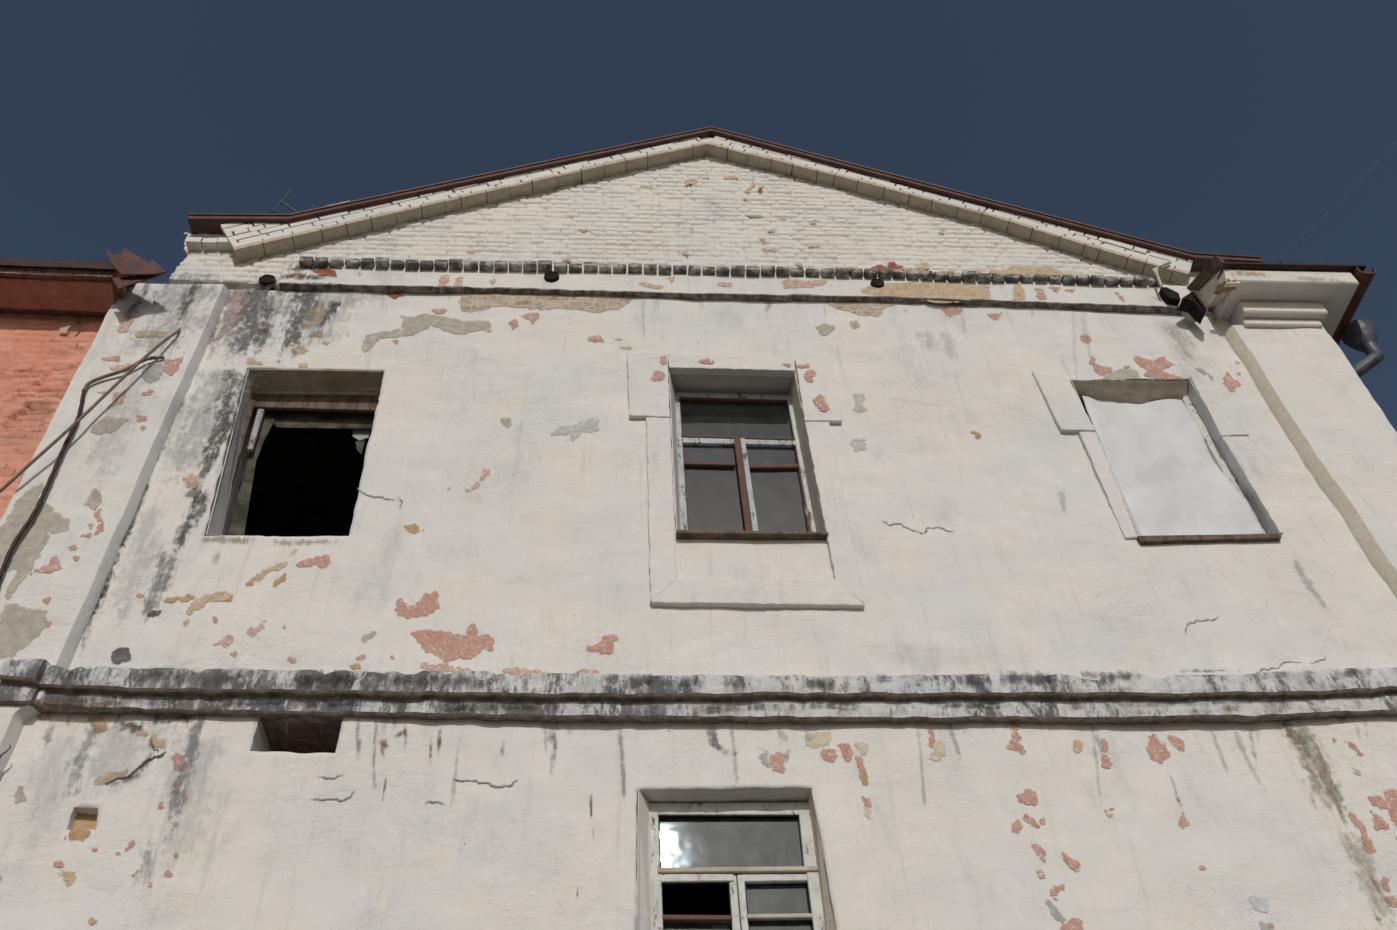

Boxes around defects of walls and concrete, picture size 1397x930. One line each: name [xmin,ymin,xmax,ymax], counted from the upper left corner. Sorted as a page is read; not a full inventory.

flaking render [361,275,674,352]
peeling [1080,334,1241,392]
crack [884,521,950,533]
peeling [0,483,104,659]
damp [83,483,149,639]
damp [111,647,131,664]
damp [224,669,376,704]
peeling [394,591,494,672]
damp [619,675,657,686]
damp [955,671,1052,685]
crack [105,737,166,784]
peeling [1012,788,1084,930]